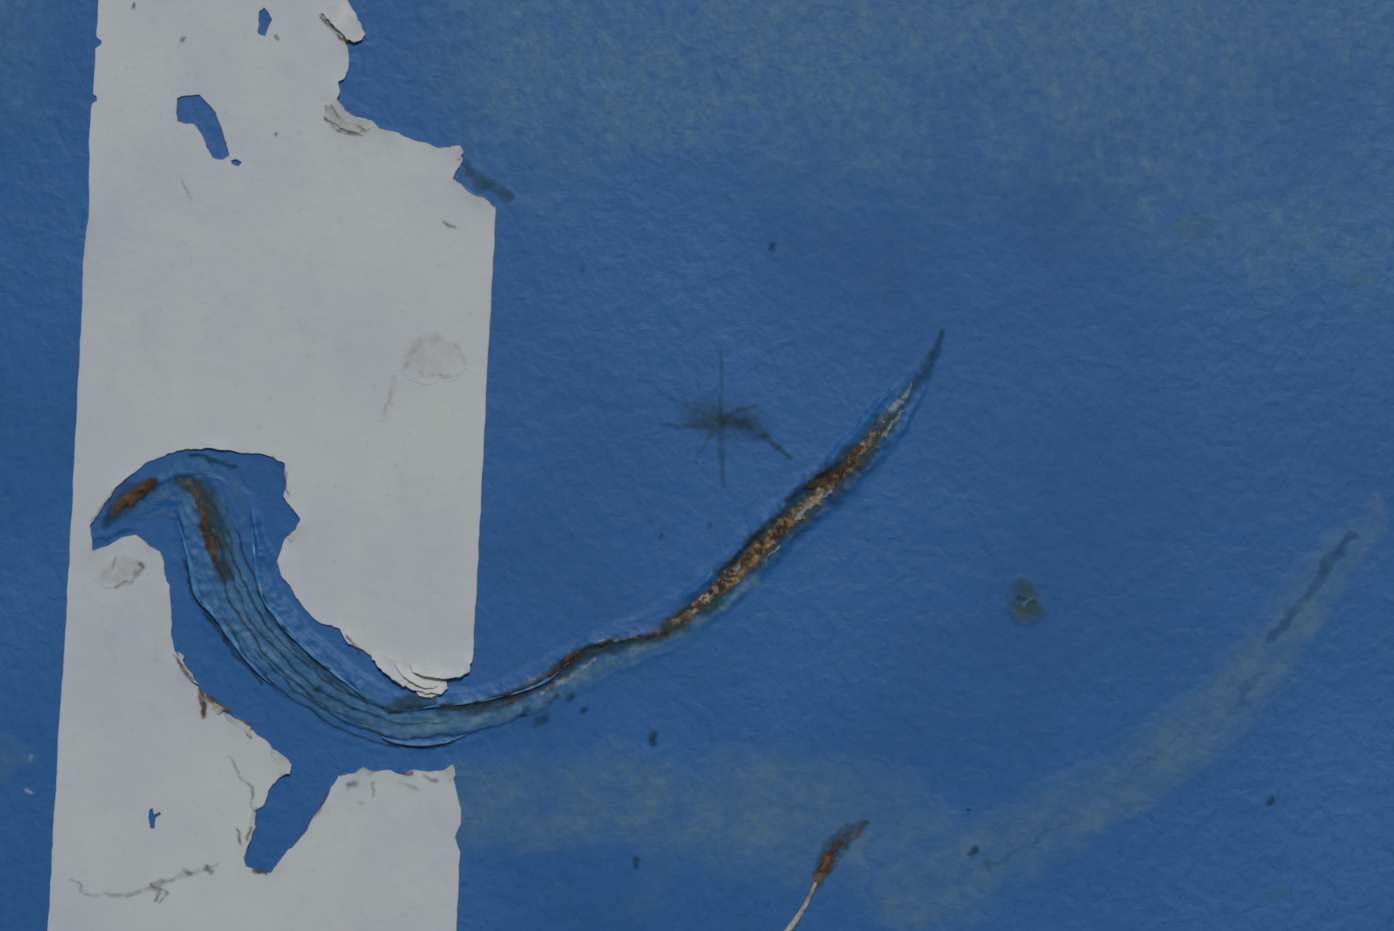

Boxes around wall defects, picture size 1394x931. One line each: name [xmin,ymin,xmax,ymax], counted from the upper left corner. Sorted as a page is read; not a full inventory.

peeling [176,95,242,166]
peeling [321,0,464,186]
rust [104,478,157,526]
rust [174,476,232,581]
spalling [90,330,943,874]
rust [439,413,897,710]
rust [811,821,869,887]